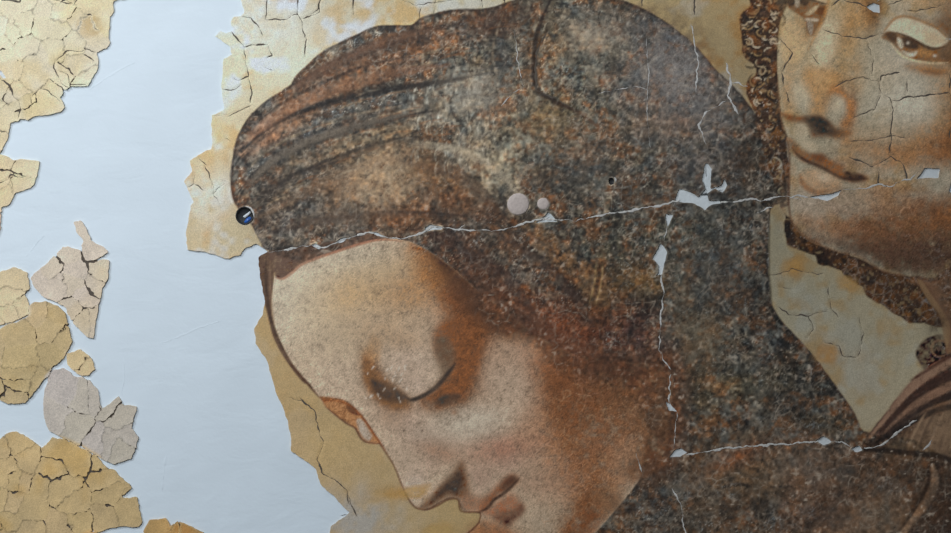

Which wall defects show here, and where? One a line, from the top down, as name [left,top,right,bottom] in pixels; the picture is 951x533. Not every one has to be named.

crack [0,0,97,132]
peeling [0,0,116,230]
crack [219,0,321,140]
crack [269,200,680,253]
crack [697,63,743,144]
crack [719,194,808,213]
crack [825,30,951,190]
peeling [917,168,940,179]
crack [36,251,106,345]
crack [8,357,136,530]
peeling [0,221,204,533]
crack [659,268,917,455]